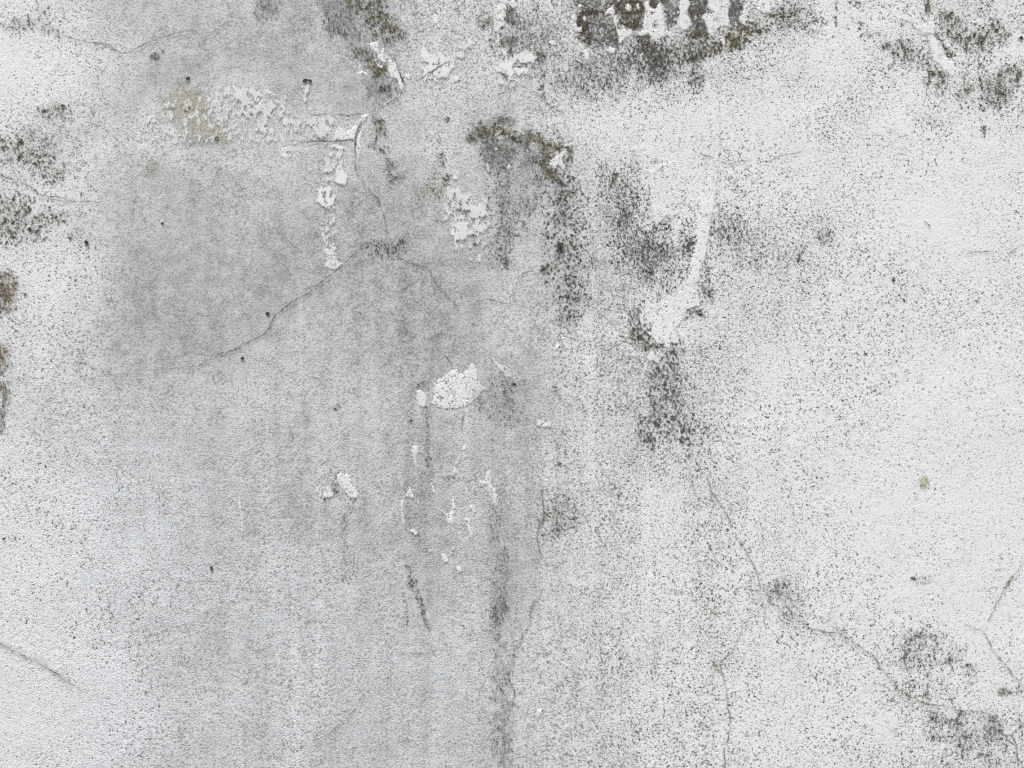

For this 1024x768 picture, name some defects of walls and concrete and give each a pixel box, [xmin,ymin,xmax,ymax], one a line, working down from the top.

water stain [489,0,714,101]
water stain [728,0,743,24]
peeling [145,77,369,270]
peeling [443,171,490,262]
water stain [466,113,807,328]
crack [115,252,357,375]
peeling [416,363,485,410]
water stain [627,305,697,450]
peeling [315,472,360,501]
water stain [538,490,583,543]
water stain [487,495,517,768]
crack [698,460,1024,768]